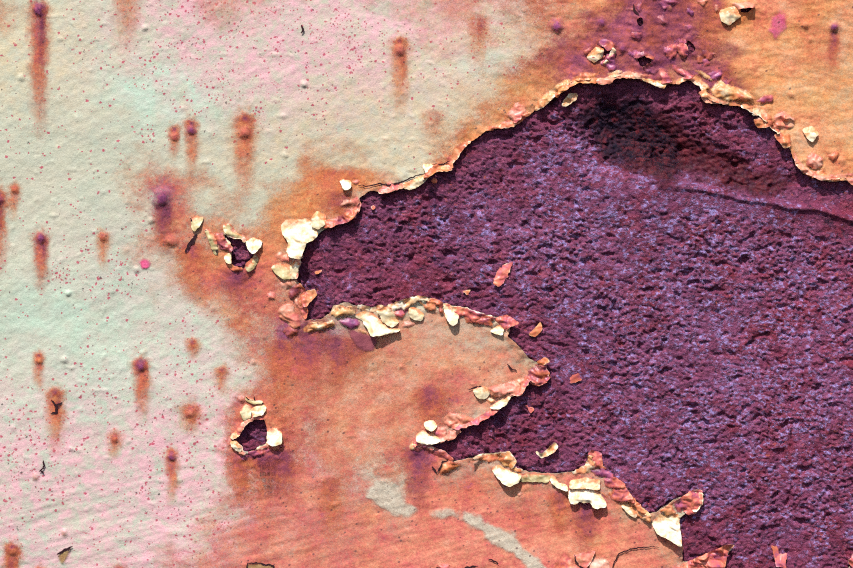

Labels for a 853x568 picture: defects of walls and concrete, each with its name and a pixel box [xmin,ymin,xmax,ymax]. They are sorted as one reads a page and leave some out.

peeling [698,0,755,25]
corrosion [31,1,49,103]
corrosion [436,0,853,181]
corrosion [170,120,197,162]
corrosion [628,113,788,196]
corrosion [34,232,48,277]
peeling [191,216,262,272]
peeling [267,65,853,568]
corrosion [47,388,65,437]
corrosion [133,356,149,407]
peeling [230,396,285,462]
corrosion [142,157,686,568]